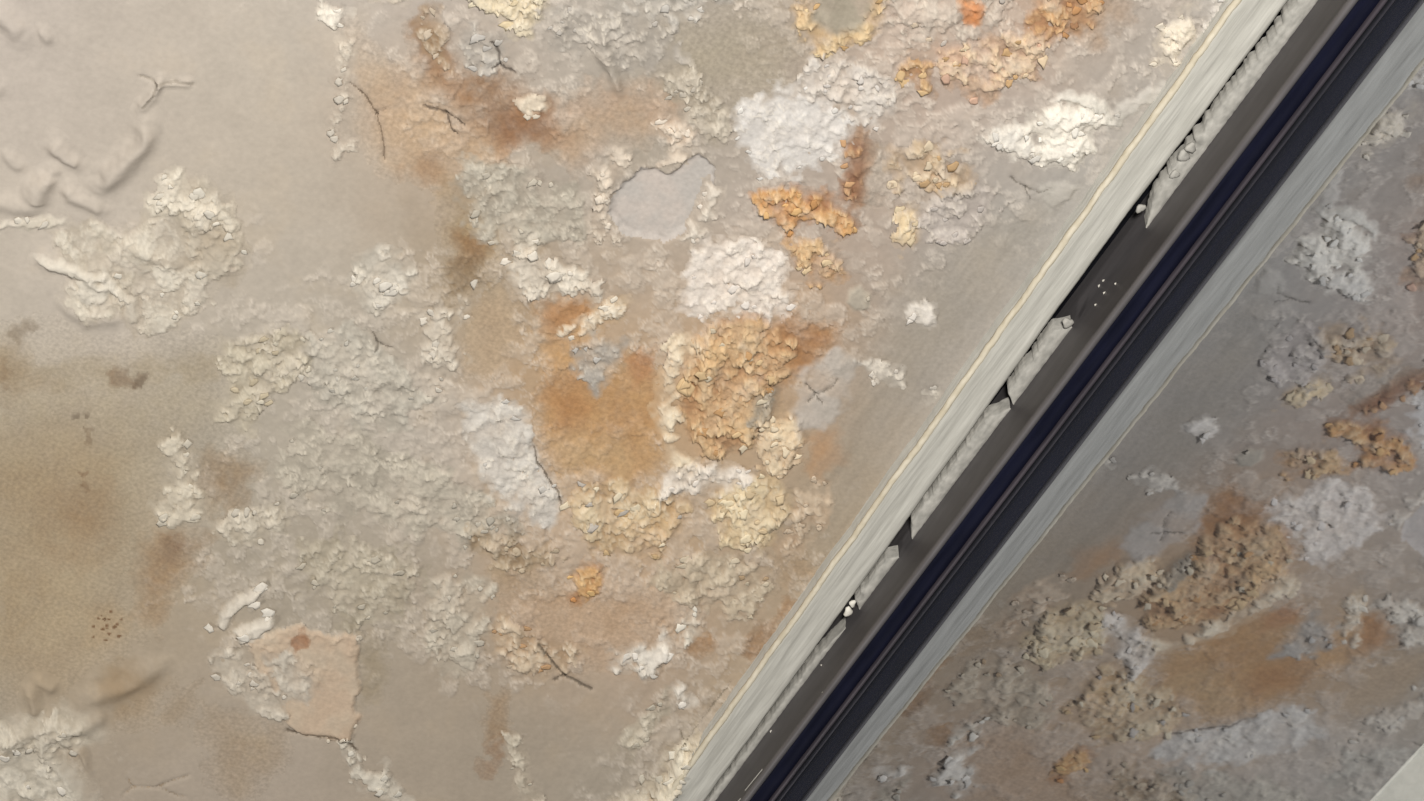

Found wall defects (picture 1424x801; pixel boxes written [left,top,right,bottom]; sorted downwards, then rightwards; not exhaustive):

peeling [0,163,254,343]
peeling [313,0,368,168]
flaking render [406,0,735,364]
corrosion [339,0,893,312]
corrosion [523,295,850,487]
peeling [790,52,1003,260]
peeling [902,295,939,331]
peeling [877,0,1017,49]
corrosion [894,0,1139,110]
peeling [146,242,836,801]
peeling [844,600,856,617]
peeling [0,695,114,801]